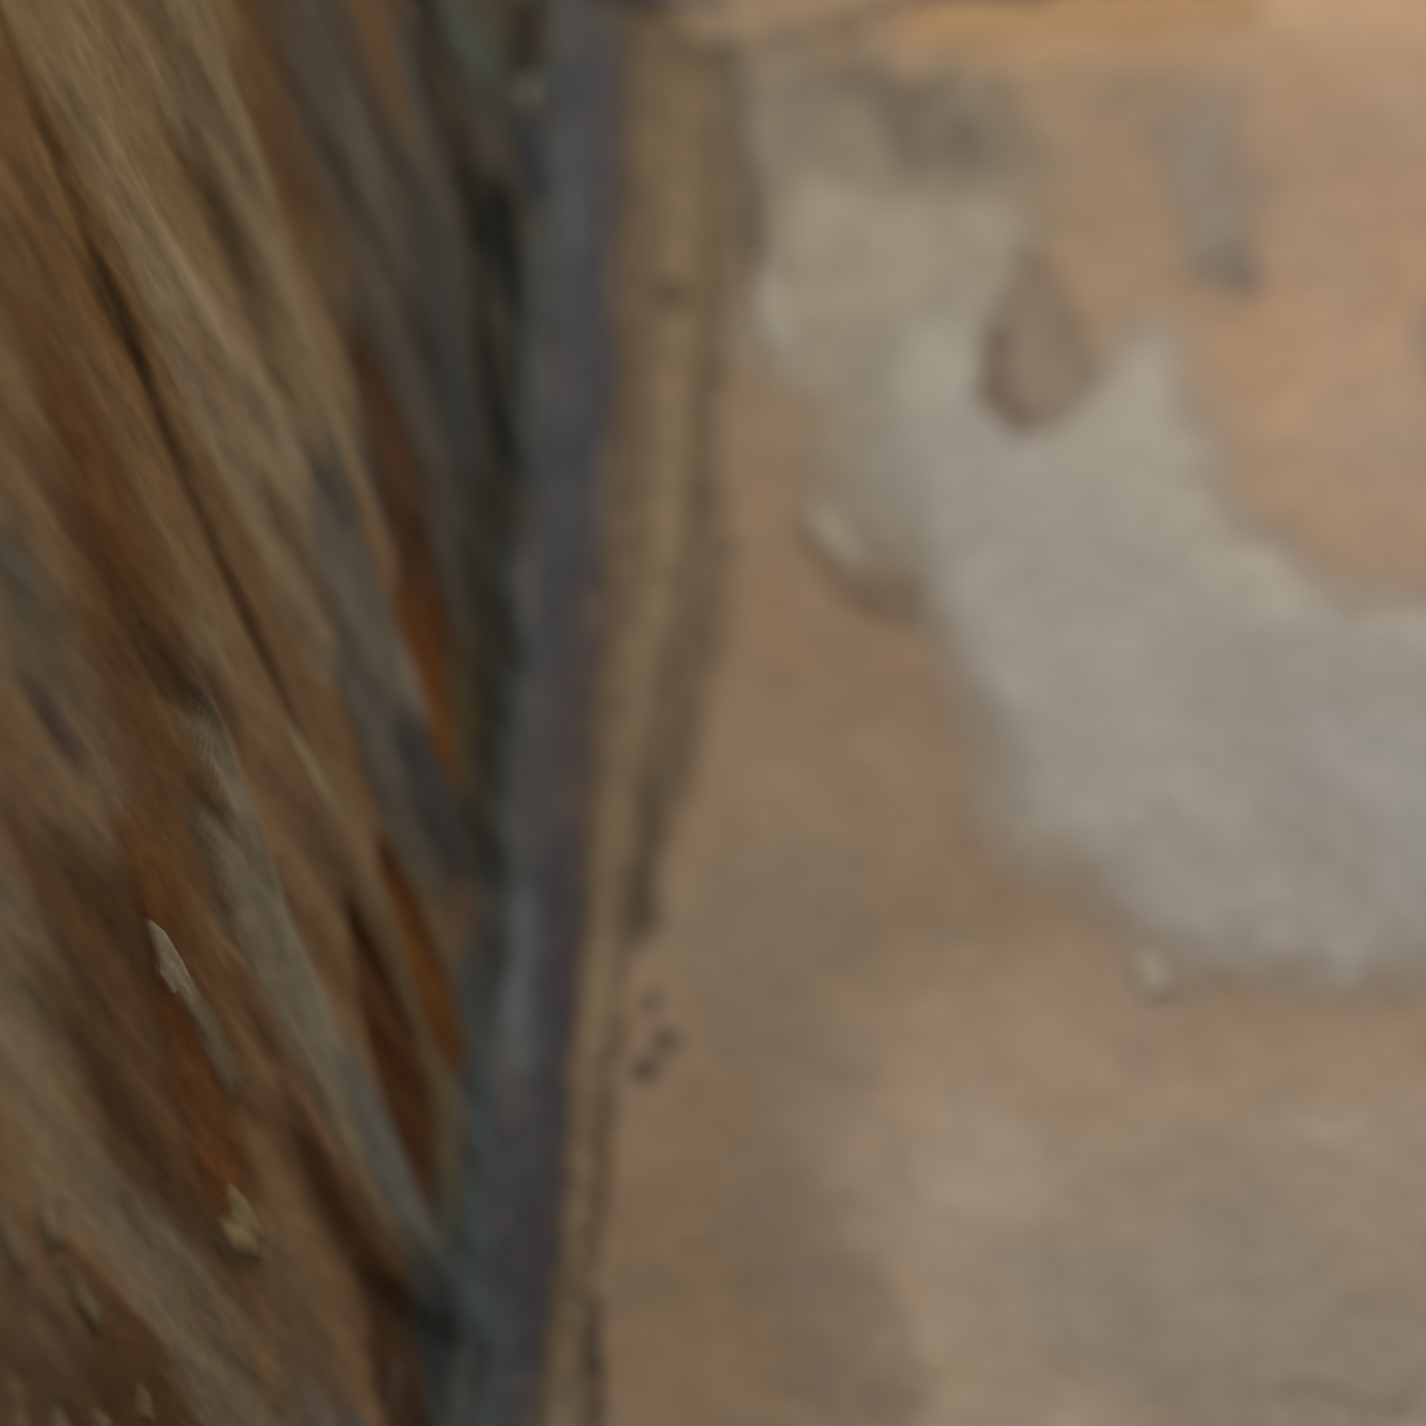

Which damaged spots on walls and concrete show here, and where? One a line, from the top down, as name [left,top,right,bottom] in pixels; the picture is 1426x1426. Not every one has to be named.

damp [720,40,1426,998]
corrosion [23,835,245,1288]
corrosion [96,1273,194,1426]
peeling [147,920,240,1087]
peeling [220,1184,263,1253]
spalling [348,836,464,1242]